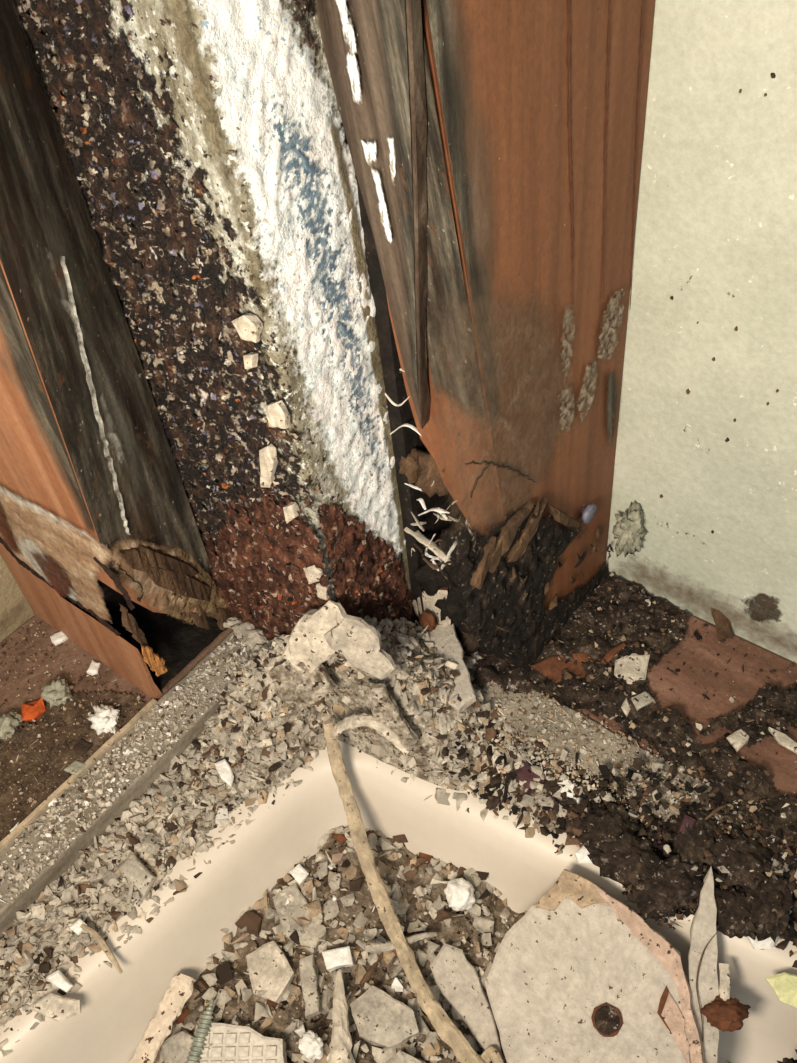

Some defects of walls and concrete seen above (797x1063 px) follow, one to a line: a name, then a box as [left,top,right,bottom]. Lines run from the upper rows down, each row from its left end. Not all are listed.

leakage [336,0,361,102]
leakage [164,0,241,232]
leakage [0,0,209,585]
leakage [361,0,625,678]
crack [465,460,536,498]
spalling [32,554,70,596]
peeling [140,644,168,677]